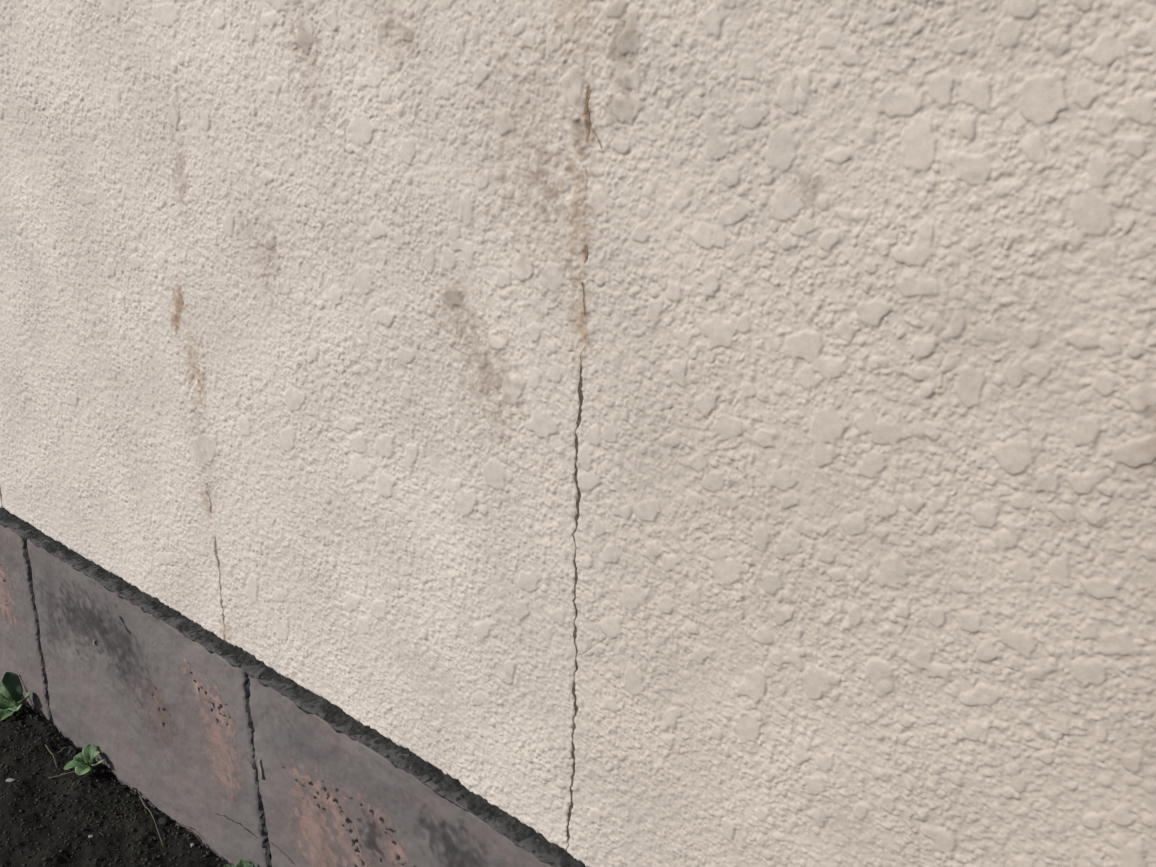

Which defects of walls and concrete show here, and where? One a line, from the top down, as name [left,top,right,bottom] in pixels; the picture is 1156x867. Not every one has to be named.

crack [585,87,602,148]
crack [206,492,225,641]
crack [562,346,607,855]